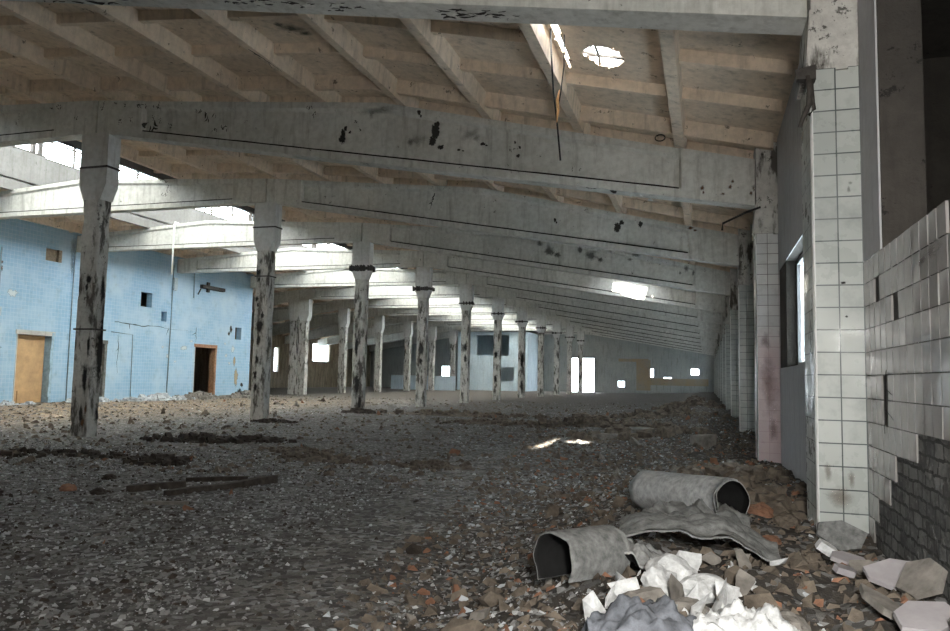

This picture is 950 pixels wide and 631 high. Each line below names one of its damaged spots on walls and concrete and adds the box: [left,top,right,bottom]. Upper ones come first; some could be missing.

spalling [578,43,628,69]